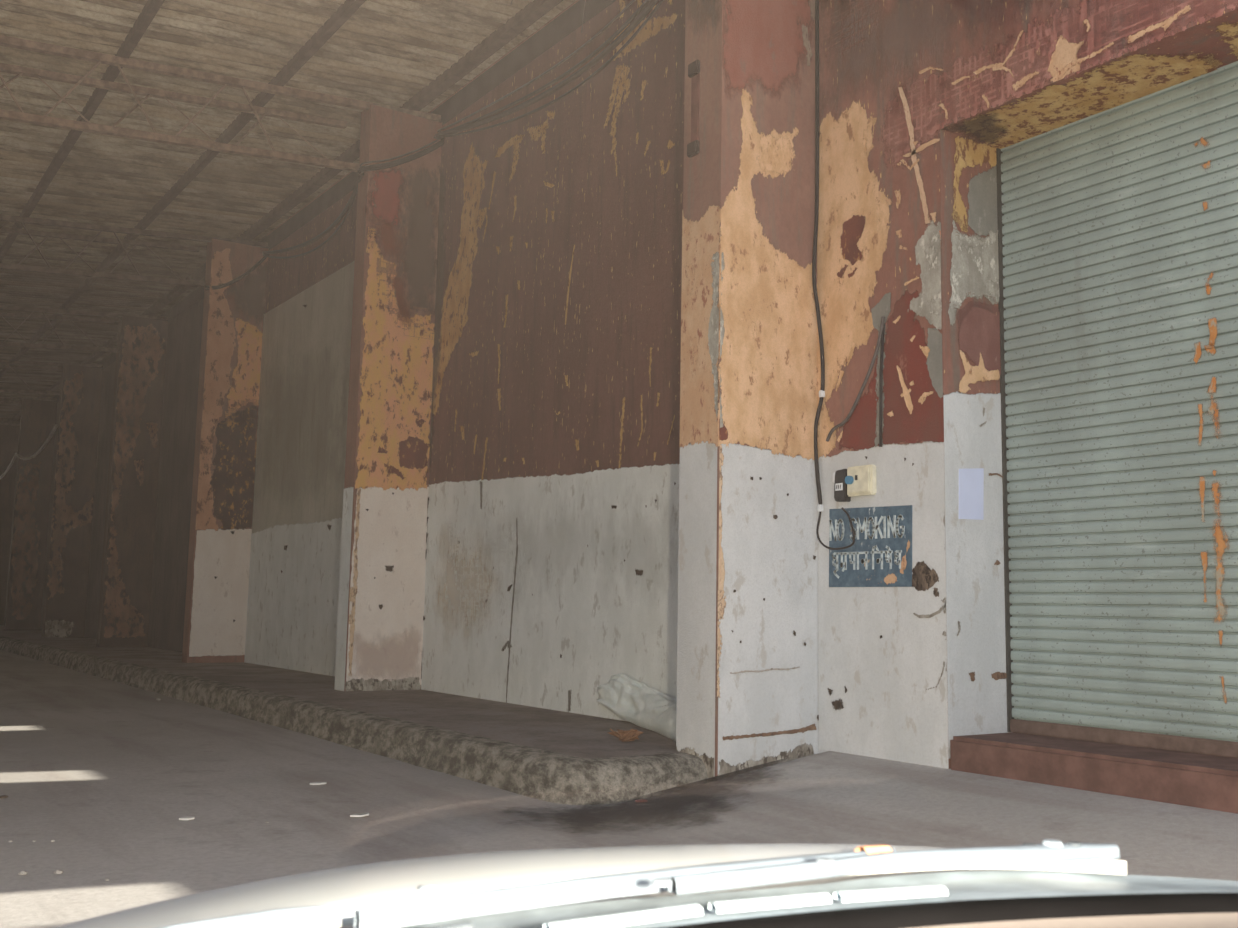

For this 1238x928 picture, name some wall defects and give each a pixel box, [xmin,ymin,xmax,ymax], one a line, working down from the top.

peeling [604,0,677,155]
peeling [919,5,1238,232]
peeling [196,248,263,534]
peeling [355,110,555,494]
peeling [680,89,907,460]
peeling [896,365,933,414]
peeling [959,350,1000,393]
corrosion [1193,318,1217,363]
corrosion [1198,377,1219,446]
corrosion [1200,470,1228,645]
spalling [827,686,847,710]